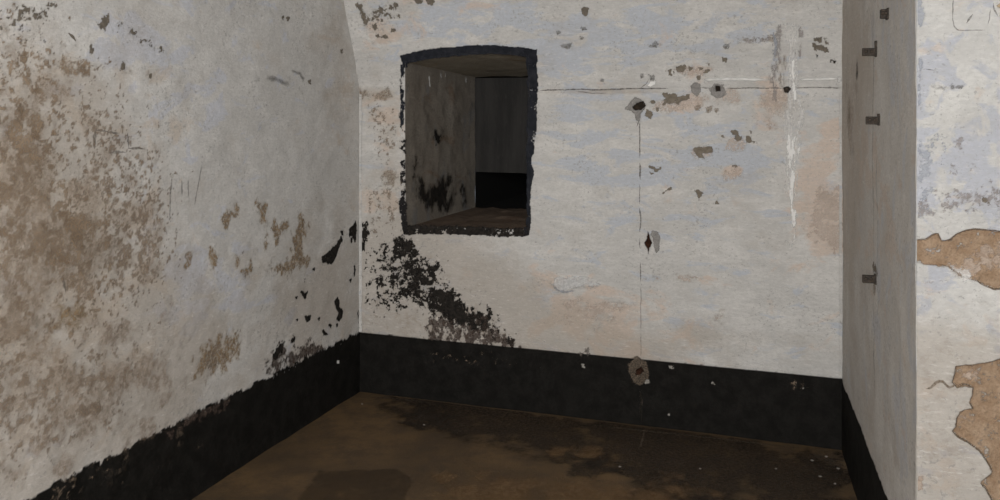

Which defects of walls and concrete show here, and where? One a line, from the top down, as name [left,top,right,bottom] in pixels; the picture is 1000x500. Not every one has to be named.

flaking render [668,63,711,80]
flaking render [633,74,719,119]
flaking render [693,146,713,158]
flaking render [721,130,755,149]
water stain [0,3,181,459]
water stain [362,171,521,348]
flaking render [917,229,1000,290]
water stain [265,335,324,374]
flaking render [952,359,1000,500]